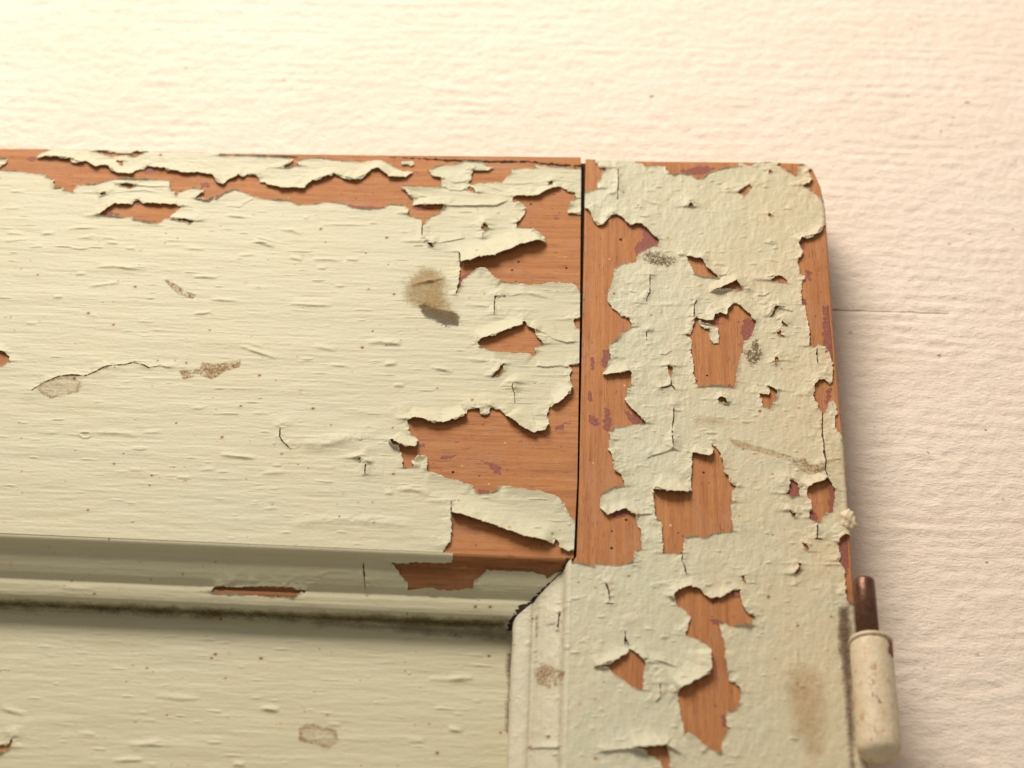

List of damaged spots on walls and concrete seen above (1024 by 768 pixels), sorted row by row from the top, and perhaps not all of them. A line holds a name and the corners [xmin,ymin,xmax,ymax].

peeling [768,164,820,197]
leakage [409,272,453,317]
peeling [686,225,839,432]
peeling [0,151,753,591]
peeling [786,474,838,523]
peeling [211,583,305,598]
peeling [835,530,852,603]
peeling [594,576,755,754]
peeling [605,736,677,768]